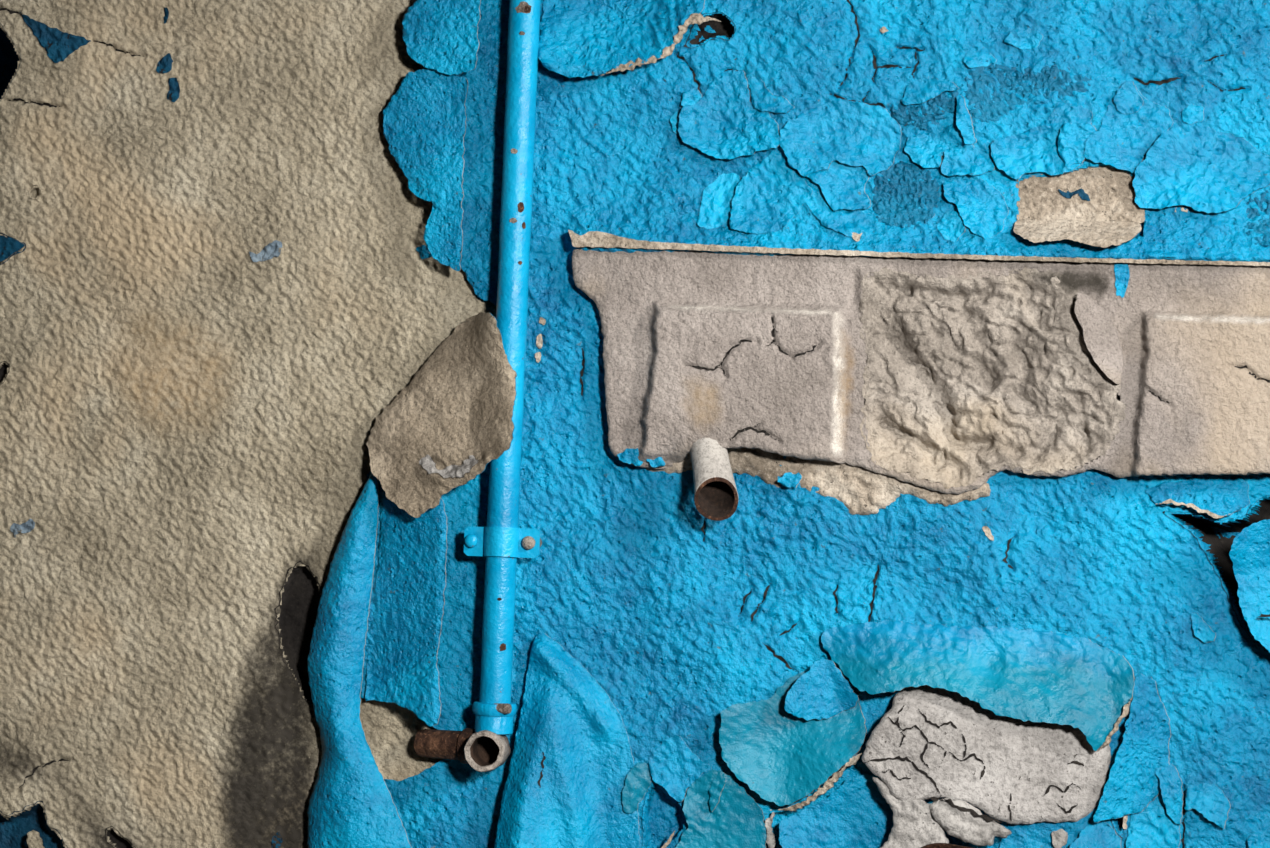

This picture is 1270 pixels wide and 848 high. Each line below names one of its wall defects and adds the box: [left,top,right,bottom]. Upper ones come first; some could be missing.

peeling [515,0,721,78]
peeling [963,51,997,68]
peeling [1004,27,1043,50]
peeling [383,0,481,271]
peeling [670,70,1270,248]
peeling [0,235,25,262]
spalling [0,361,10,385]
crack [686,317,819,376]
spalling [858,267,1127,489]
peeling [360,482,447,781]
flaking render [622,620,1231,848]
spalling [105,826,136,848]